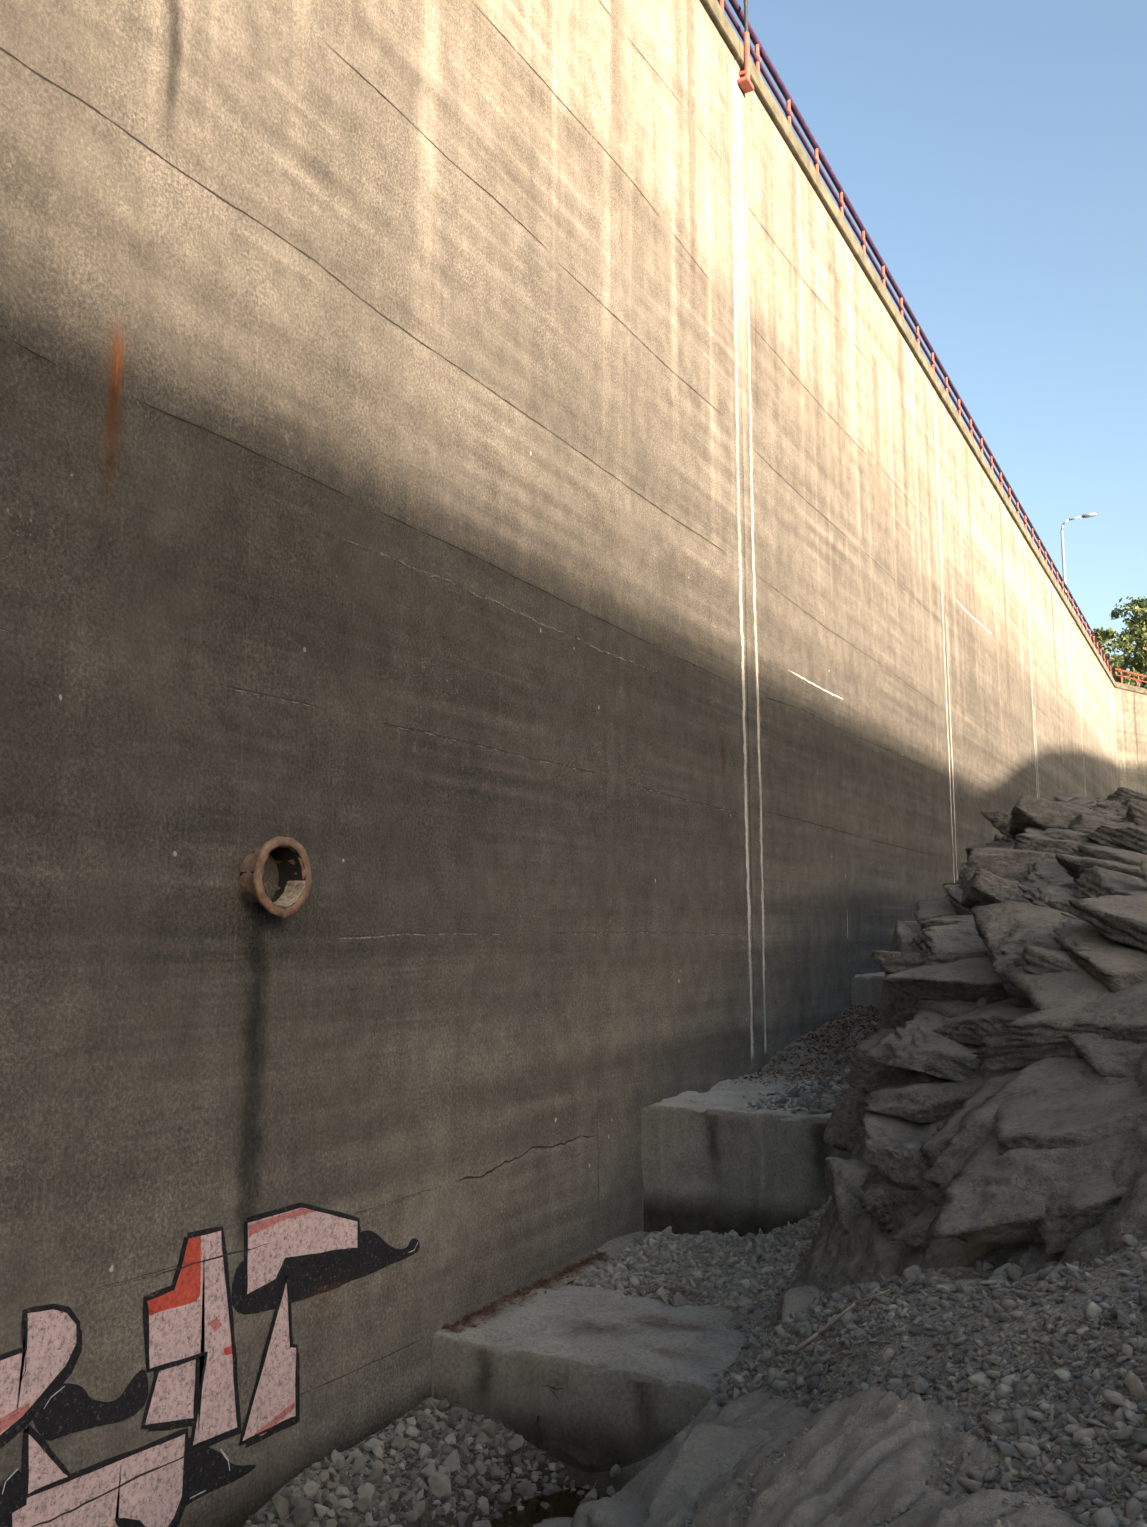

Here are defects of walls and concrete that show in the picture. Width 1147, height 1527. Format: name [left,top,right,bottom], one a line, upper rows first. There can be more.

crack [350,1135,597,1215]